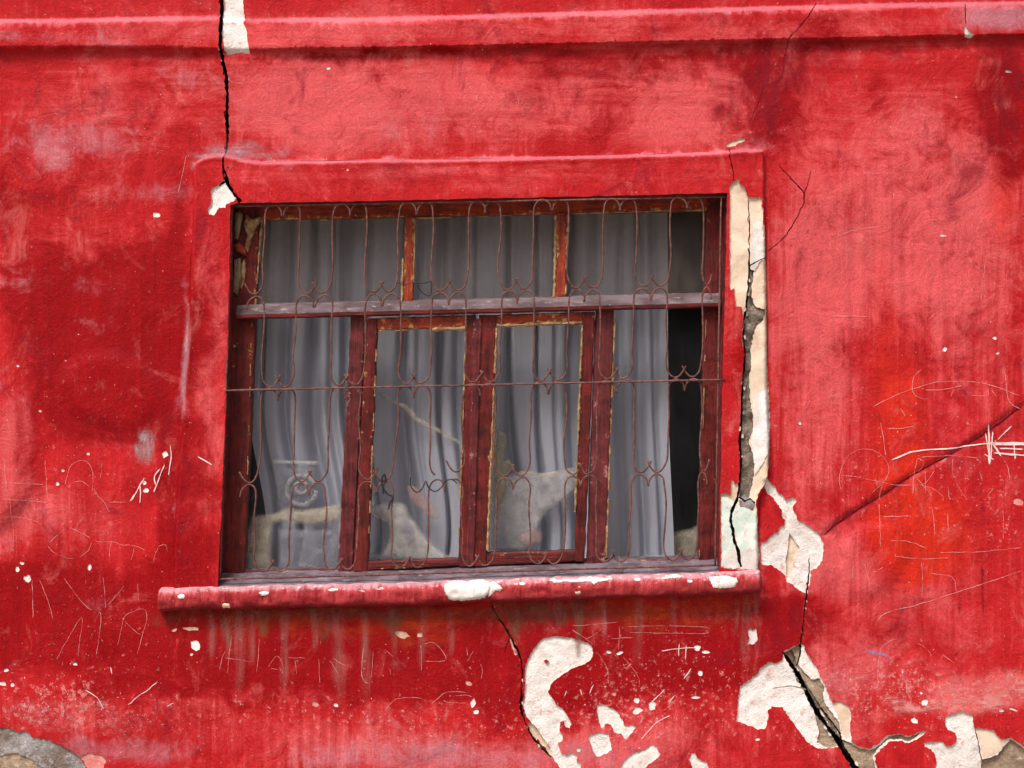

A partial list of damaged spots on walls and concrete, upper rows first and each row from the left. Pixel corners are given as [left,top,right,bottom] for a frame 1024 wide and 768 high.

peeling [222,0,250,55]
crack [218,0,242,204]
peeling [208,183,235,215]
peeling [750,220,765,271]
crack [729,149,811,567]
peeling [709,389,824,594]
spalling [444,579,503,601]
peeling [0,727,106,768]
crack [490,603,551,757]
peeling [509,636,661,768]
crack [773,558,859,768]
peeling [736,644,1024,768]